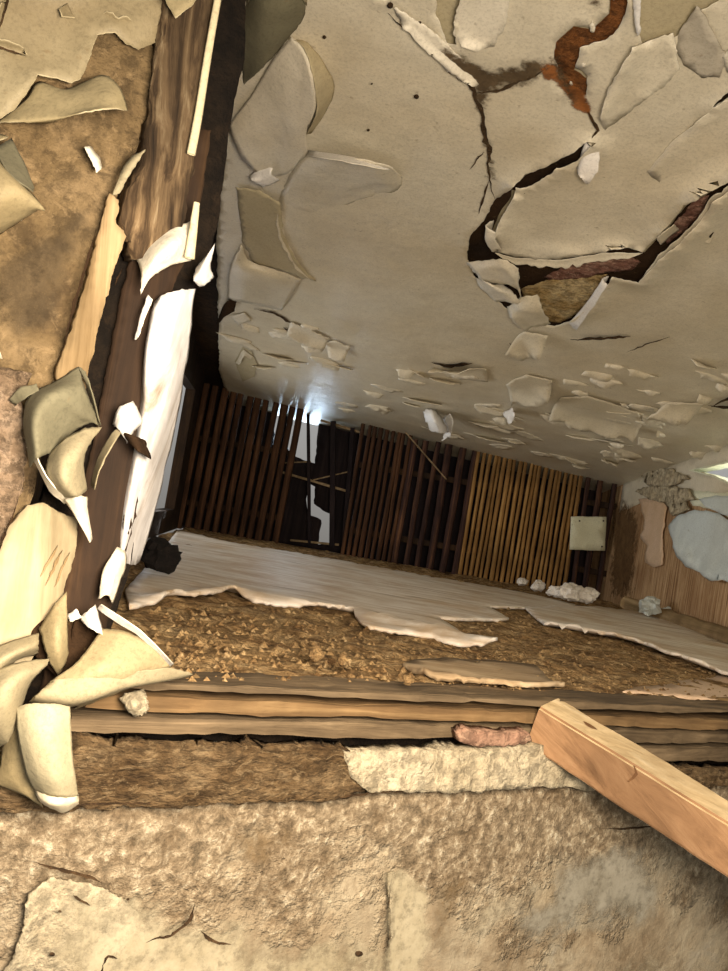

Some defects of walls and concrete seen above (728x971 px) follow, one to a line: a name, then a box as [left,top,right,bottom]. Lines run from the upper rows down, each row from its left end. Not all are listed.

peeling [0,0,196,235]
peeling [216,0,402,381]
crack [388,7,543,212]
peeling [453,0,510,52]
rust [542,0,628,113]
crack [588,112,600,138]
peeling [466,142,728,361]
peeling [600,0,728,130]
peeling [647,93,728,182]
peeling [0,222,215,813]
flaking render [335,359,728,582]